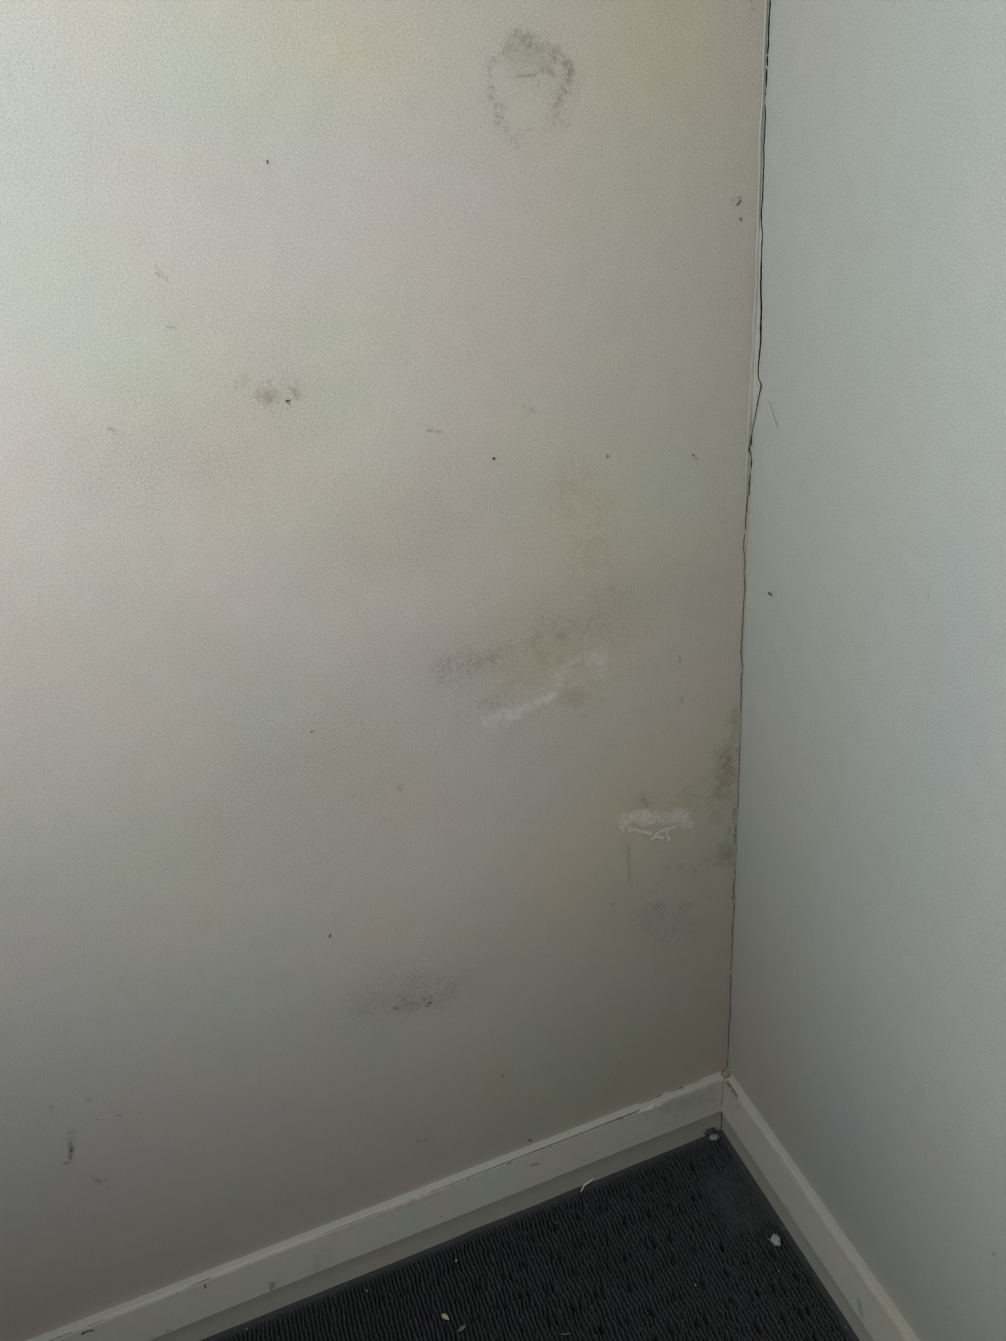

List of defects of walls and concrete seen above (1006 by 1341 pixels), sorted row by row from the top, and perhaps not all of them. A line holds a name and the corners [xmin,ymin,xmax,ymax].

damp [483,25,585,152]
damp [427,459,635,720]
crack [426,0,773,1194]